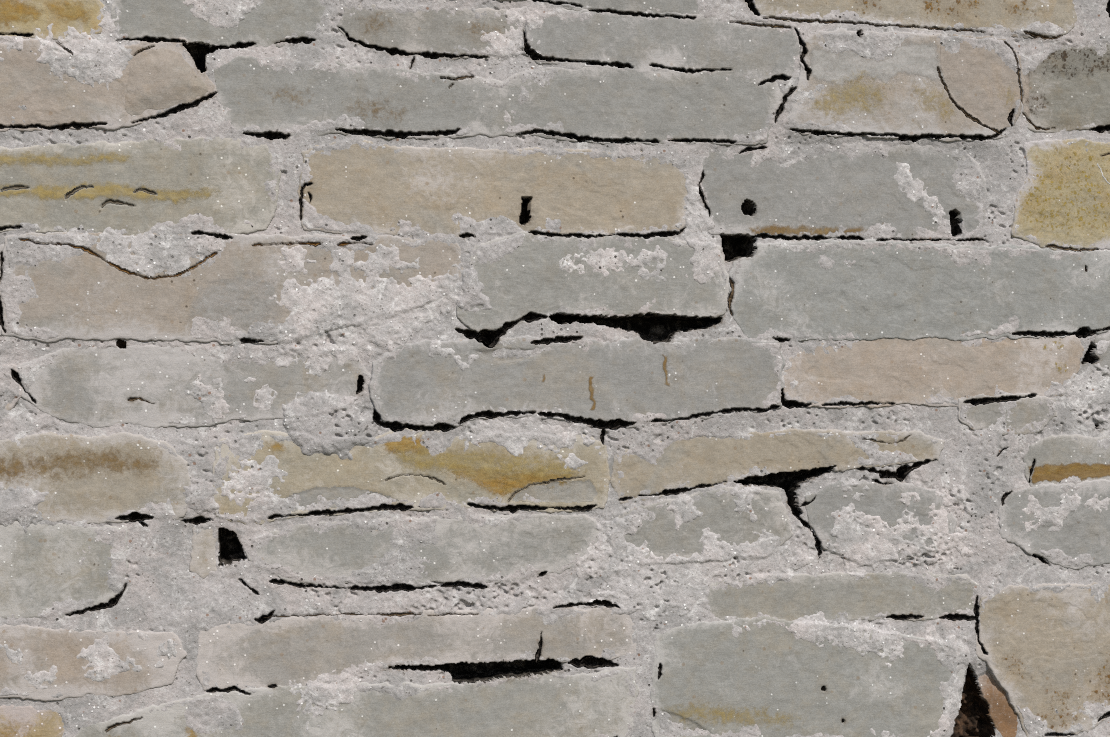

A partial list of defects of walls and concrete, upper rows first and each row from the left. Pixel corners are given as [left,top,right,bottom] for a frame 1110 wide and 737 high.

crack [938,68,1014,134]
crack [0,239,217,333]
crack [791,496,822,558]